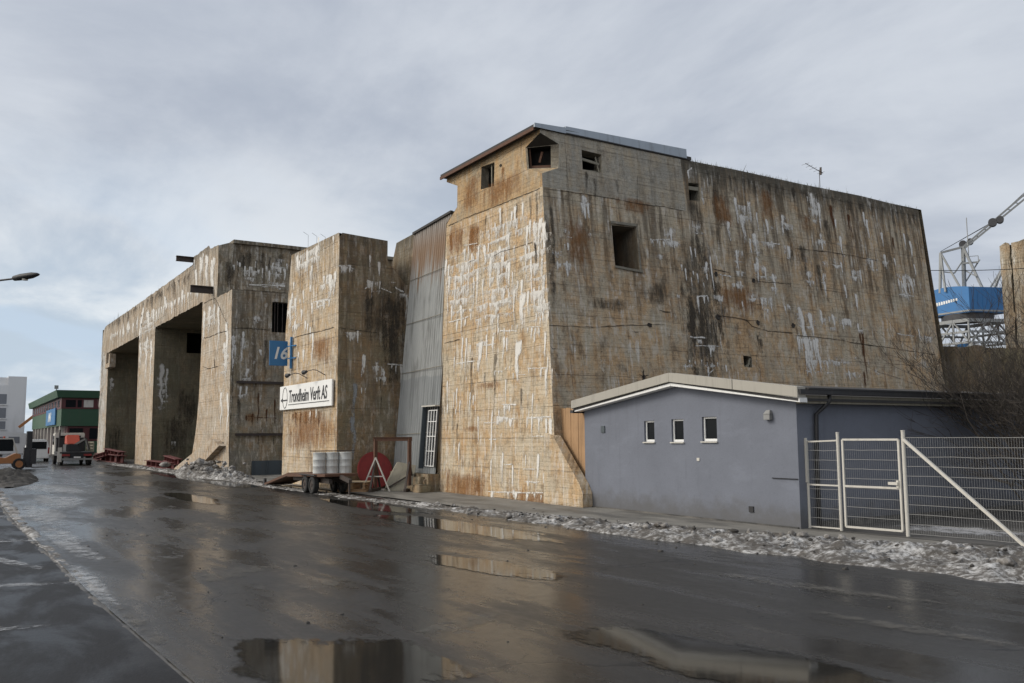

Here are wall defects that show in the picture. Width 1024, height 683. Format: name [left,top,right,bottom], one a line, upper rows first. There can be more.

damp [110,236,352,455]
damp [347,255,408,459]
damp [444,200,572,500]
damp [650,171,916,381]